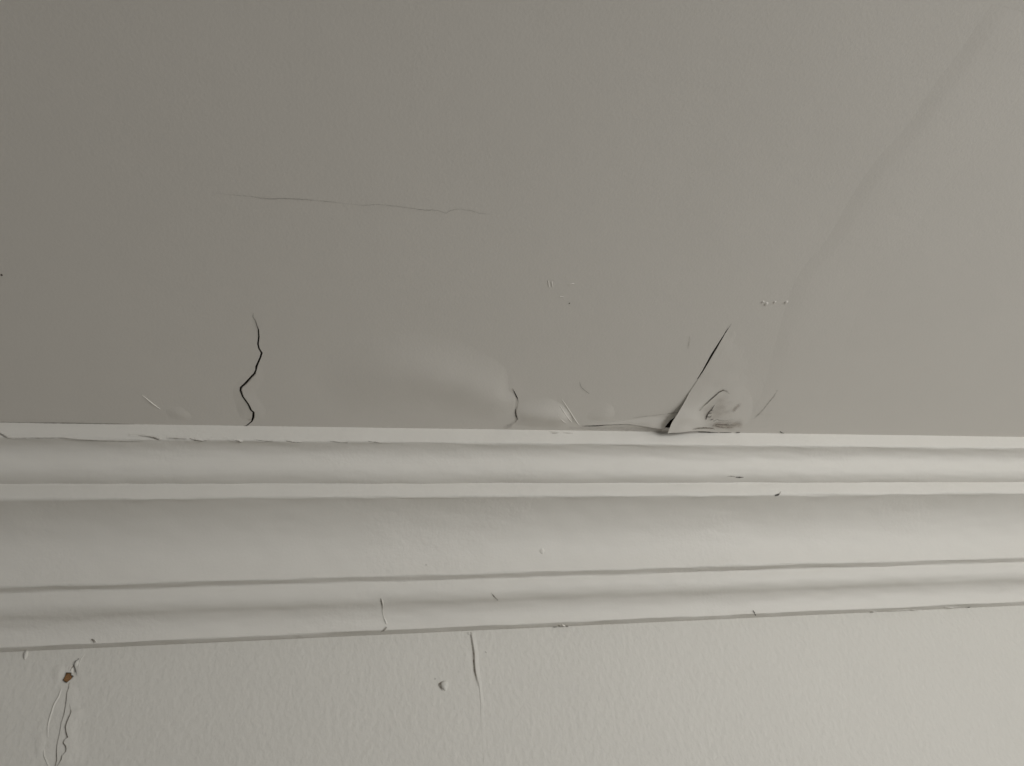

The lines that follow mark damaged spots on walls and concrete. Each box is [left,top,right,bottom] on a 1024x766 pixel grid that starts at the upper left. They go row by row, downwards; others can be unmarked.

crack [233,323,266,426]
peeling [665,328,753,433]